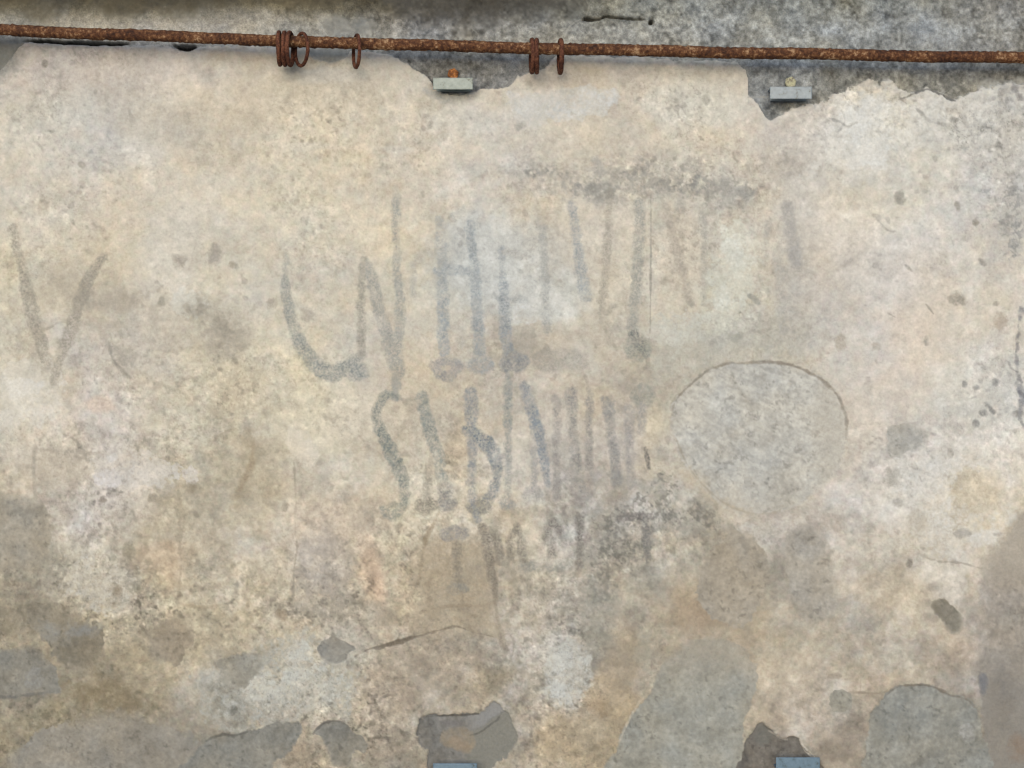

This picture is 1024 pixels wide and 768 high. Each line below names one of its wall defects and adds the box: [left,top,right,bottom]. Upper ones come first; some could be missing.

flaking render [0,0,1024,120]
crack [354,625,515,665]
spalling [416,701,518,768]
spalling [736,722,824,768]
spalling [861,671,994,768]